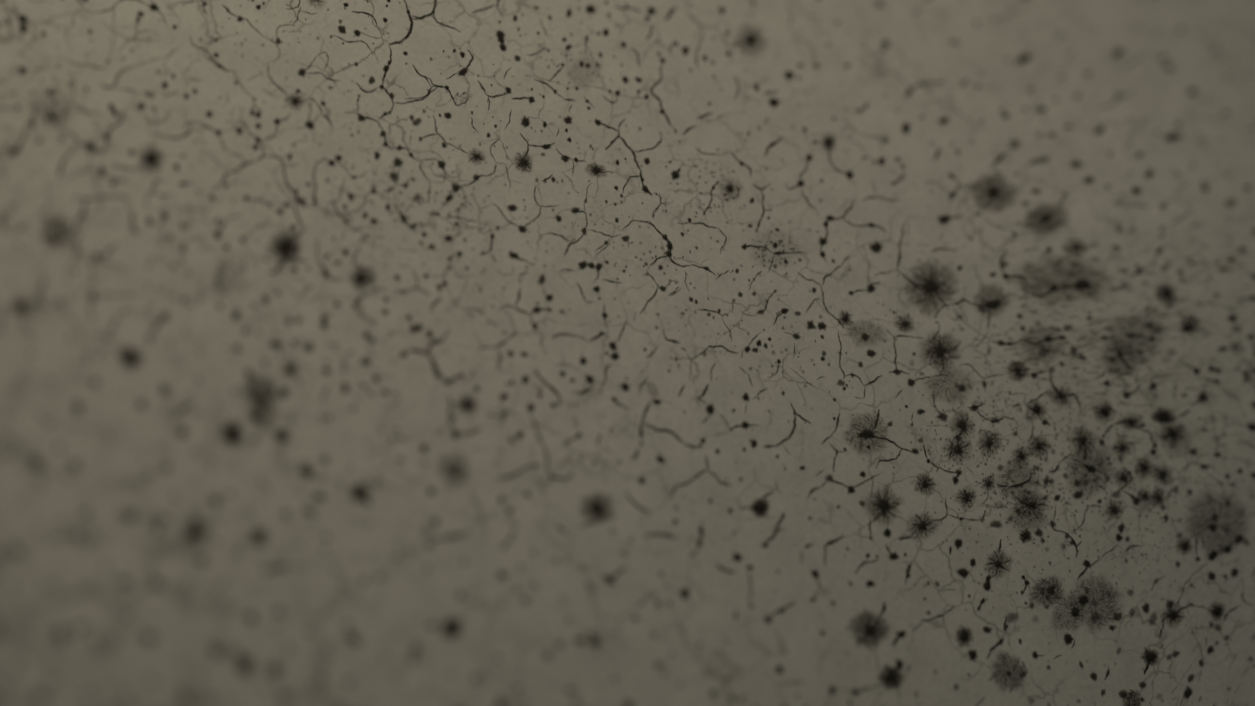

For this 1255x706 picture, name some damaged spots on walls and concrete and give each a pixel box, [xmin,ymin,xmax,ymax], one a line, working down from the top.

damp [504,265,570,356]
crack [66,0,1240,585]
damp [1012,189,1098,300]
damp [836,421,892,453]
damp [827,471,910,577]
damp [905,261,1255,698]
damp [852,605,905,645]
damp [879,660,917,696]
crack [880,581,1075,706]
crack [1143,539,1255,674]